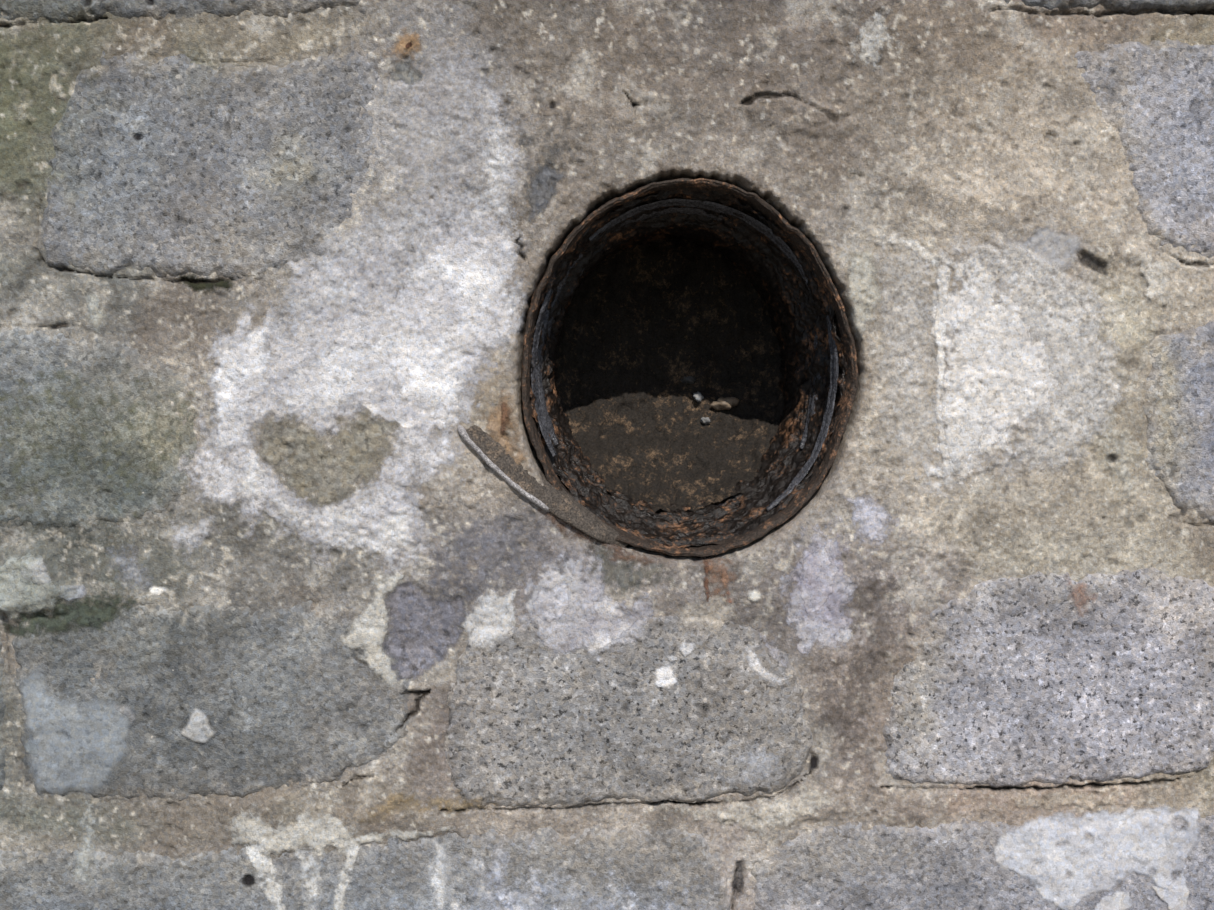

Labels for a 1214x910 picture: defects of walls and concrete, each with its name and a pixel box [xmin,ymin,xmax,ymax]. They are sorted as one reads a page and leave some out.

crack [742,93,831,116]
peeling [209,40,564,559]
rust [540,509,655,564]
leakage [230,804,558,910]
leakage [571,863,672,910]
peeling [994,806,1199,910]